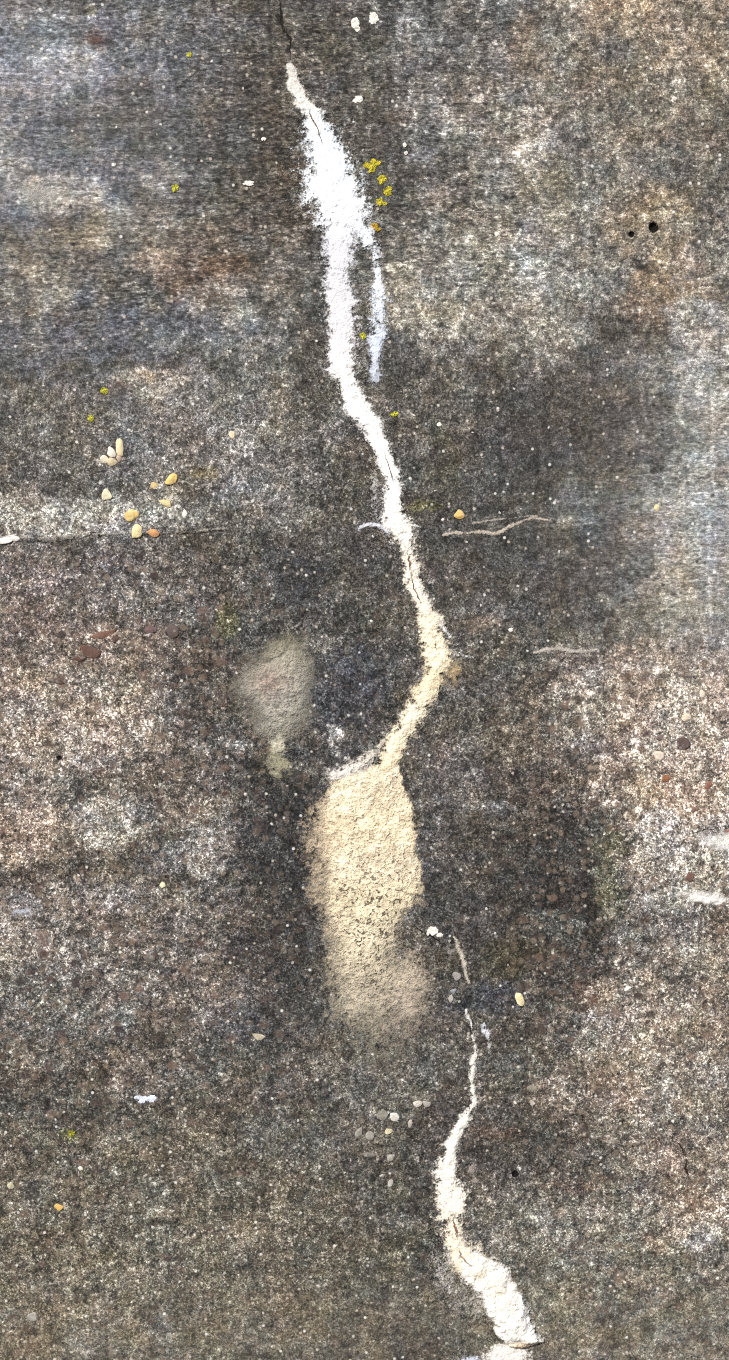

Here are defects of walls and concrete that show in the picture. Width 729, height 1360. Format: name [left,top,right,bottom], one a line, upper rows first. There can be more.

crack [279,0,291,56]
damp [286,63,474,1075]
damp [442,515,551,536]
damp [430,1009,544,1360]